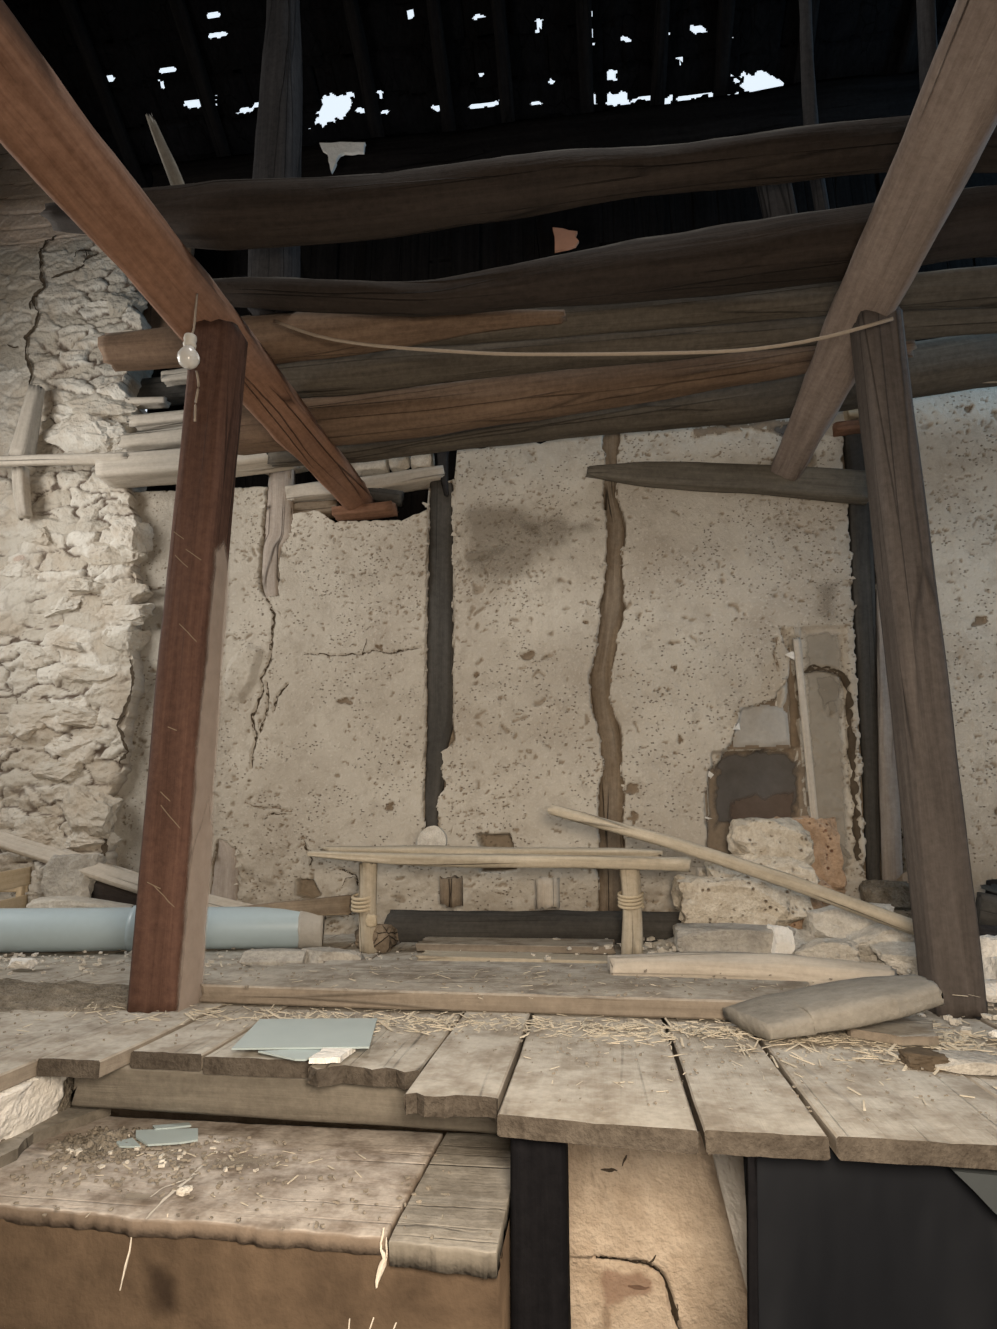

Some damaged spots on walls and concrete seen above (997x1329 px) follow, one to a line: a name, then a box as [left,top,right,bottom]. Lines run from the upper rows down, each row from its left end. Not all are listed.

crack [8,235,97,384]
crack [251,598,289,768]
flaking render [705,633,882,880]
crack [245,802,359,887]